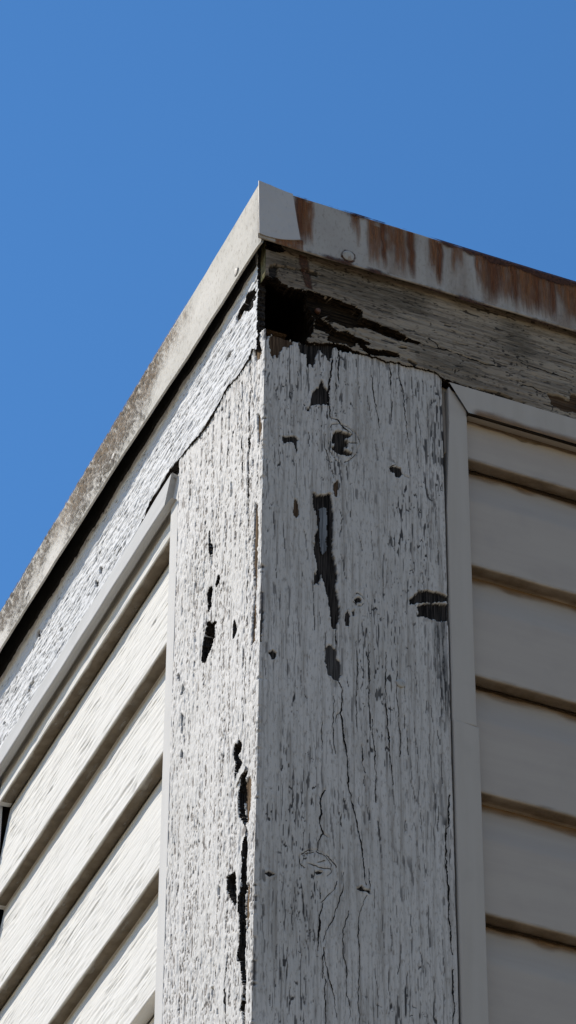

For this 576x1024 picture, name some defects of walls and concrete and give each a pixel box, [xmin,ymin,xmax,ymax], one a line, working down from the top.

peeling [237,289,257,320]
rust [275,196,313,290]
rust [350,212,415,277]
rust [429,238,576,324]
peeling [266,336,333,418]
crack [227,376,252,526]
peeling [312,481,340,681]
peeling [235,764,246,788]
crack [299,644,409,1023]